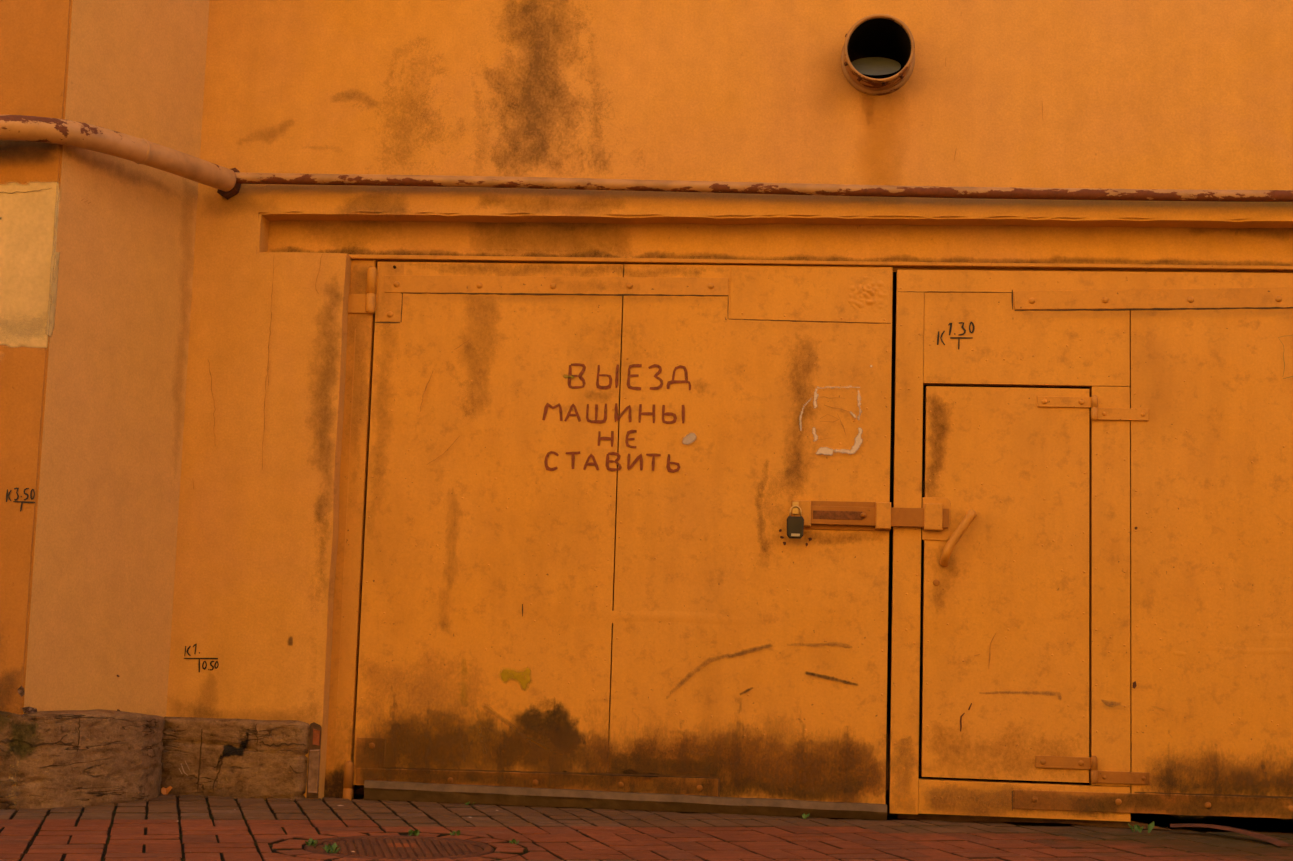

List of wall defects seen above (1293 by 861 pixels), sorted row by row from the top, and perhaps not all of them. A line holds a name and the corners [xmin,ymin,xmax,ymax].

leakage [505,1,562,161]
leakage [477,705,583,757]